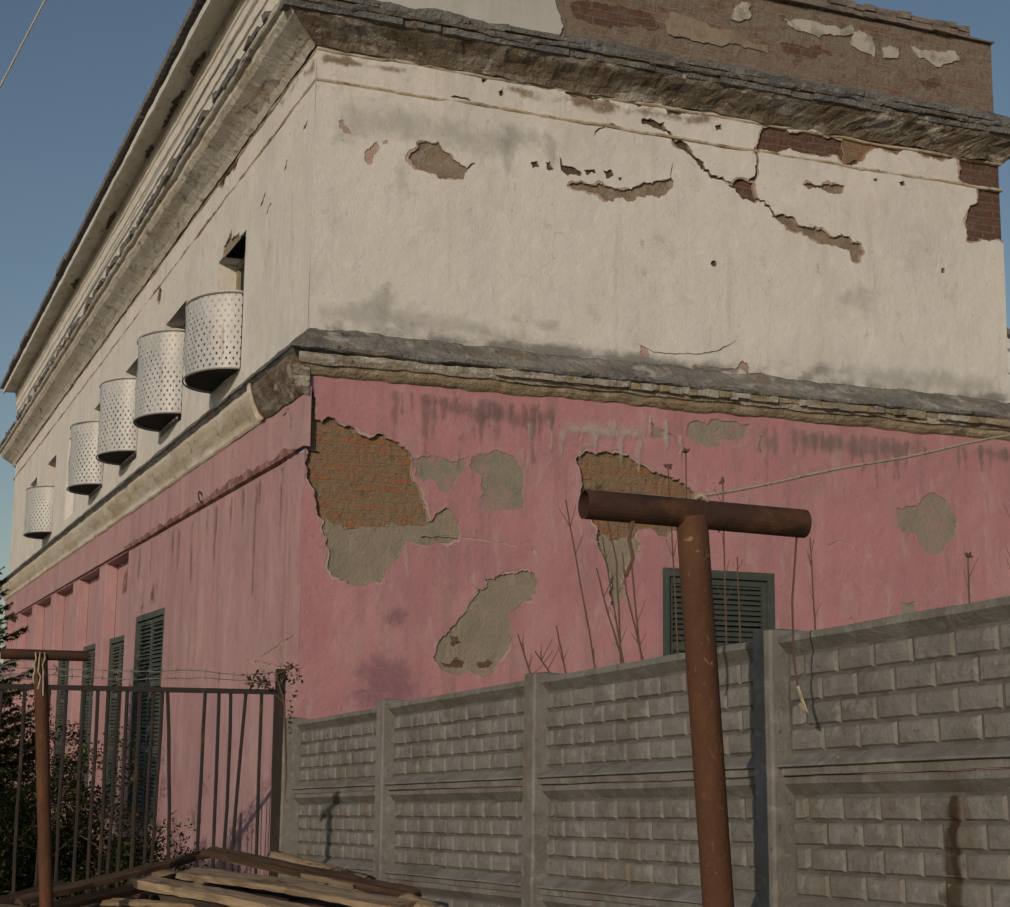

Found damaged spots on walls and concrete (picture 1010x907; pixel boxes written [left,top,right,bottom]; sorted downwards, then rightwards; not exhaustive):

flaking render [780,18,899,59]
flaking render [405,140,474,180]
flaking render [531,160,672,202]
crack [642,119,723,180]
crack [748,156,774,217]
flaking render [753,126,857,165]
flaking render [956,158,1003,243]
flaking render [772,214,865,264]
flaking render [124,395,536,586]
flaking render [574,449,695,499]
flaking render [433,567,538,677]
corrosion [945,795,962,907]